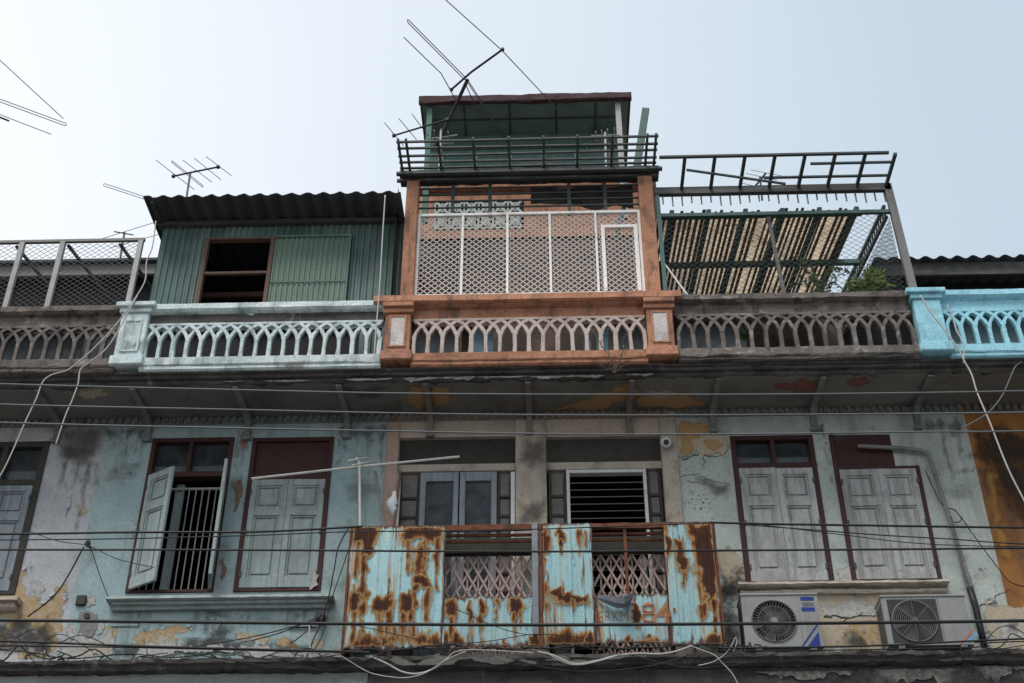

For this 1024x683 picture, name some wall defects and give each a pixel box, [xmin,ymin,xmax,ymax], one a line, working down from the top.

damp [62,431,99,461]
peeling [346,375,605,410]
peeling [545,374,730,458]
peeling [774,378,825,392]
damp [975,428,1024,519]
peeling [0,562,117,661]
peeling [132,624,341,659]
corrosion [347,525,595,647]
corrosion [664,524,722,644]
peeling [817,594,882,651]